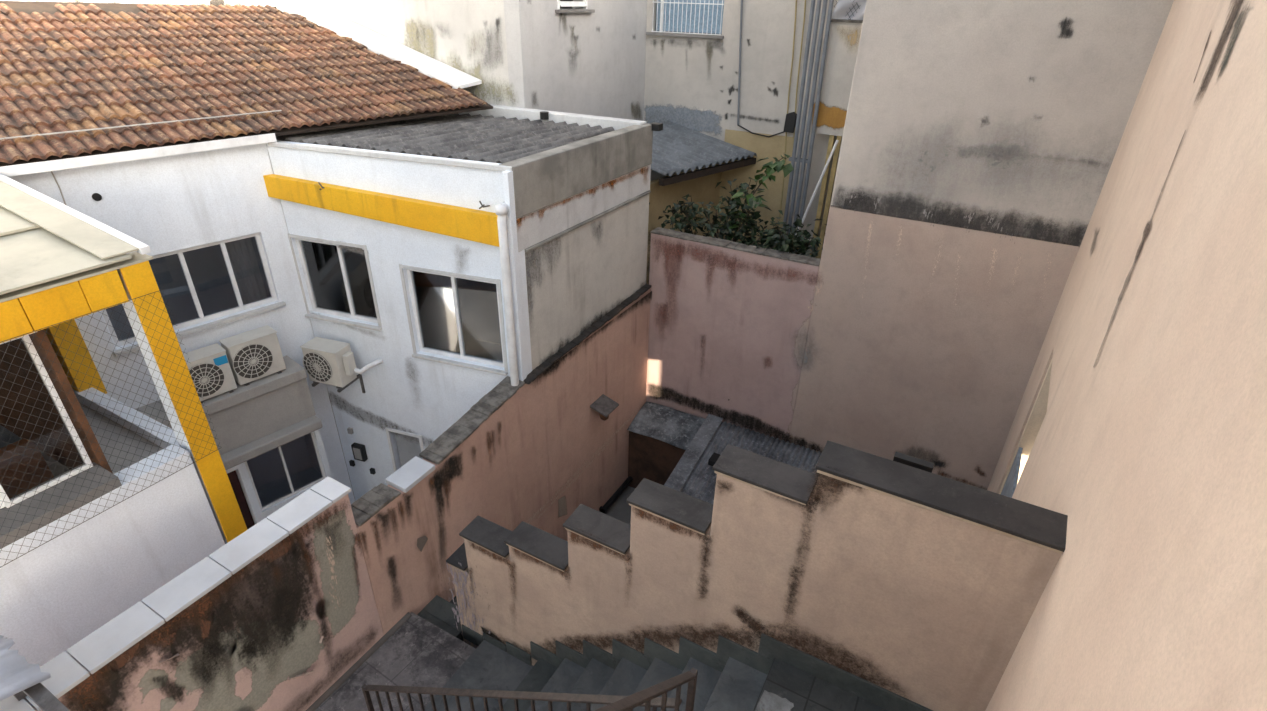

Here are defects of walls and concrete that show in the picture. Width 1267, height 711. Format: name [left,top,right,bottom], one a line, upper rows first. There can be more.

corrosion [516,168,646,225]
damp [537,231,815,382]
damp [835,189,1086,328]
peeling [137,509,360,711]
damp [429,422,501,549]
damp [470,543,570,589]
damp [570,531,632,573]
damp [441,562,901,692]
damp [635,508,711,597]
damp [785,472,862,516]